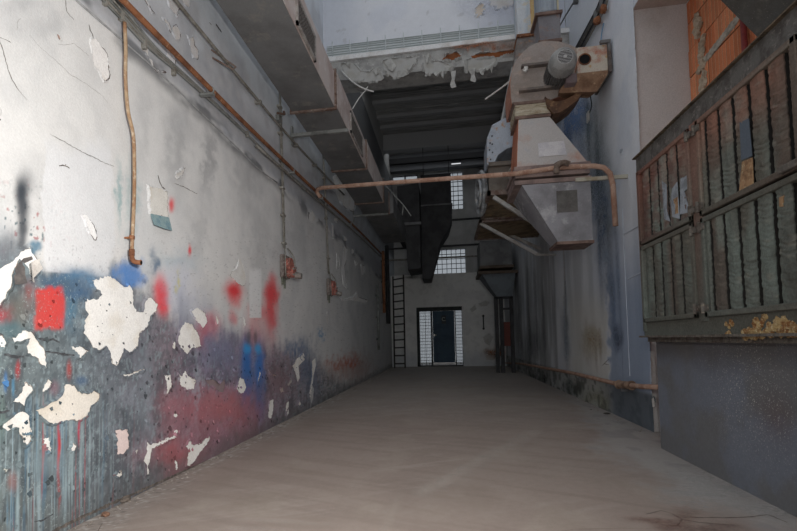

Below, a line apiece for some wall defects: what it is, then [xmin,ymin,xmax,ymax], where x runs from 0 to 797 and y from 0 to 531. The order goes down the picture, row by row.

crack [0,18,27,100]
peeling [89,37,111,83]
peeling [340,48,514,88]
peeling [0,244,43,308]
peeling [0,274,331,498]